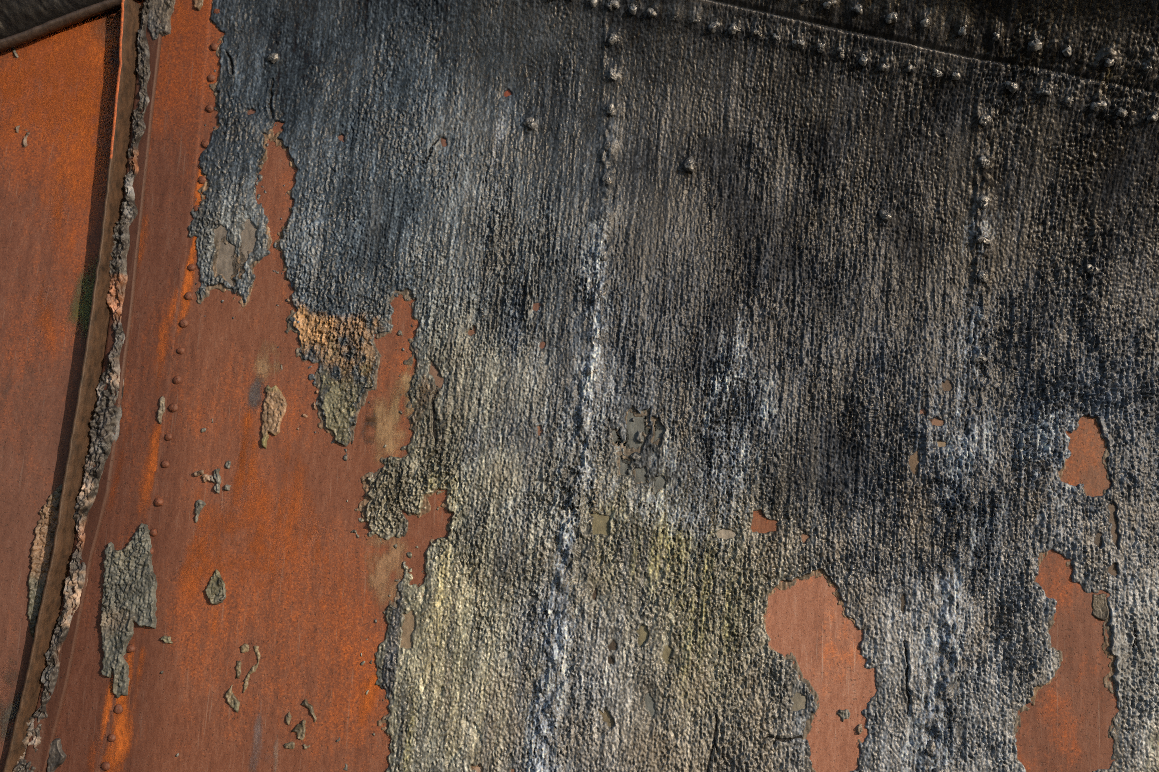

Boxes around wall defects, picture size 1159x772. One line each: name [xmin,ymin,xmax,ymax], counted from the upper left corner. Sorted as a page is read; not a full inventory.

corrosion [13,0,153,772]
corrosion [143,427,160,496]
corrosion [170,236,197,317]
peeling [98,0,454,772]
corrosion [293,308,377,444]
peeling [1059,416,1118,549]
peeling [764,570,877,772]
peeling [1015,549,1119,772]